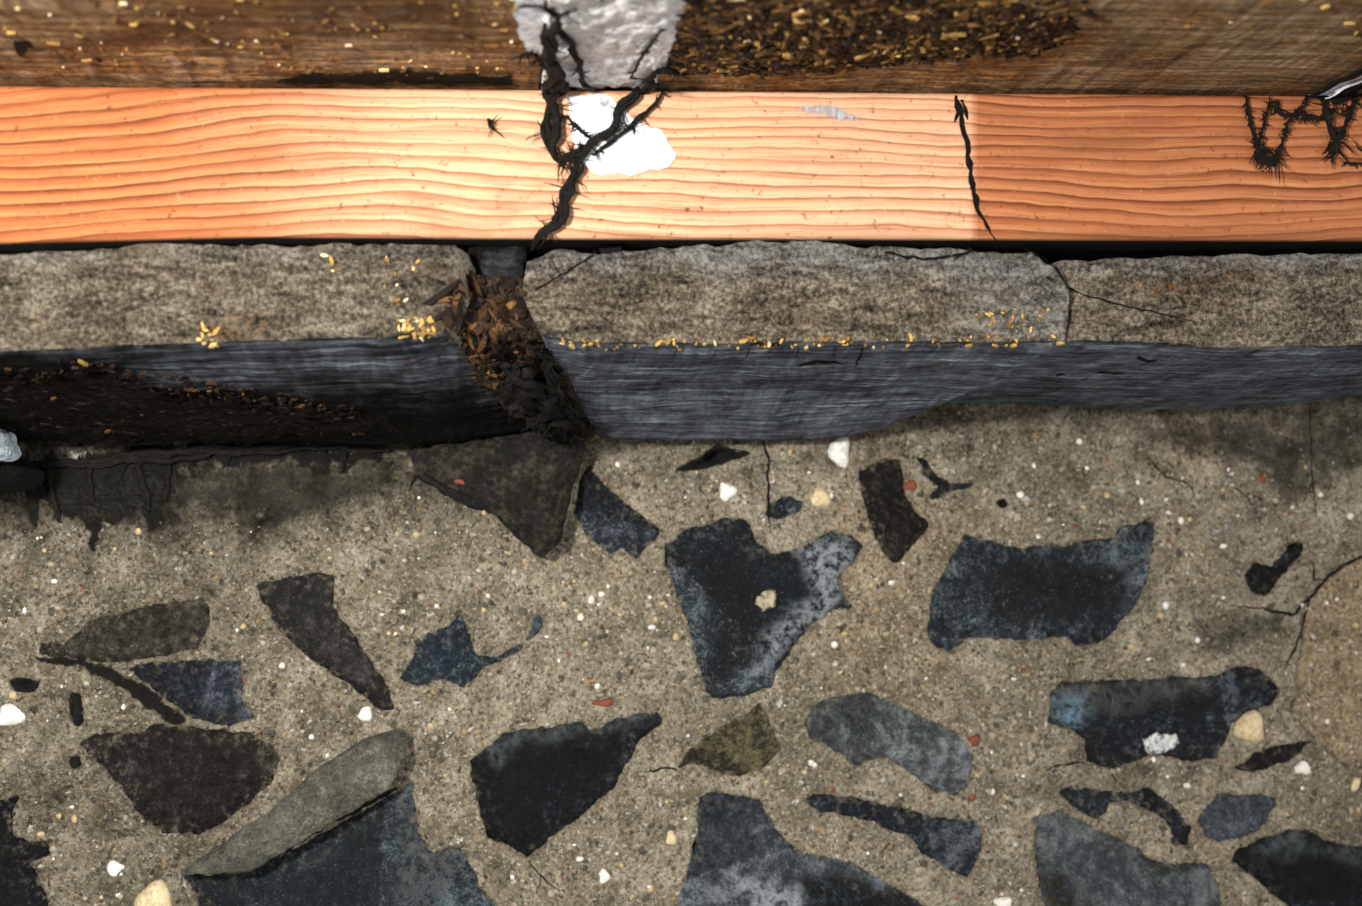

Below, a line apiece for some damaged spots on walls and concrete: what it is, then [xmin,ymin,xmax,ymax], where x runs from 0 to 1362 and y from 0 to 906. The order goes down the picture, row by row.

crack [884,93,1192,342]
crack [1233,556,1362,671]